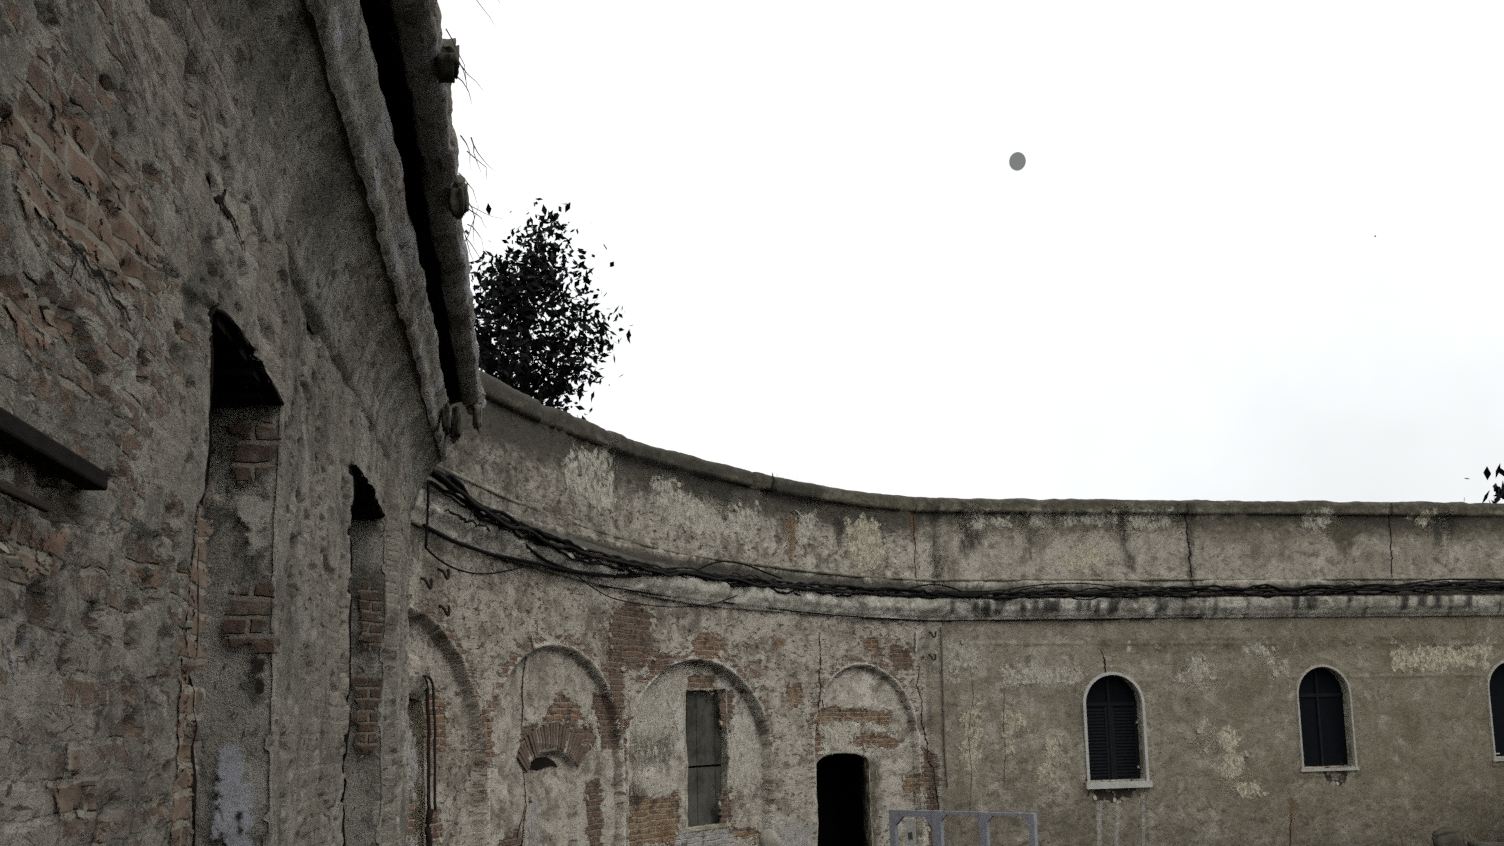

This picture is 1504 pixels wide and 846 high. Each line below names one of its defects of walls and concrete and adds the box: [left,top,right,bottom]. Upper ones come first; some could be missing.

flaking render [0,72,165,302]
flaking render [169,411,282,846]
flaking render [351,671,385,763]
flaking render [406,686,452,846]
flaking render [469,714,499,767]
flaking render [497,794,541,846]
flaking render [517,598,773,846]